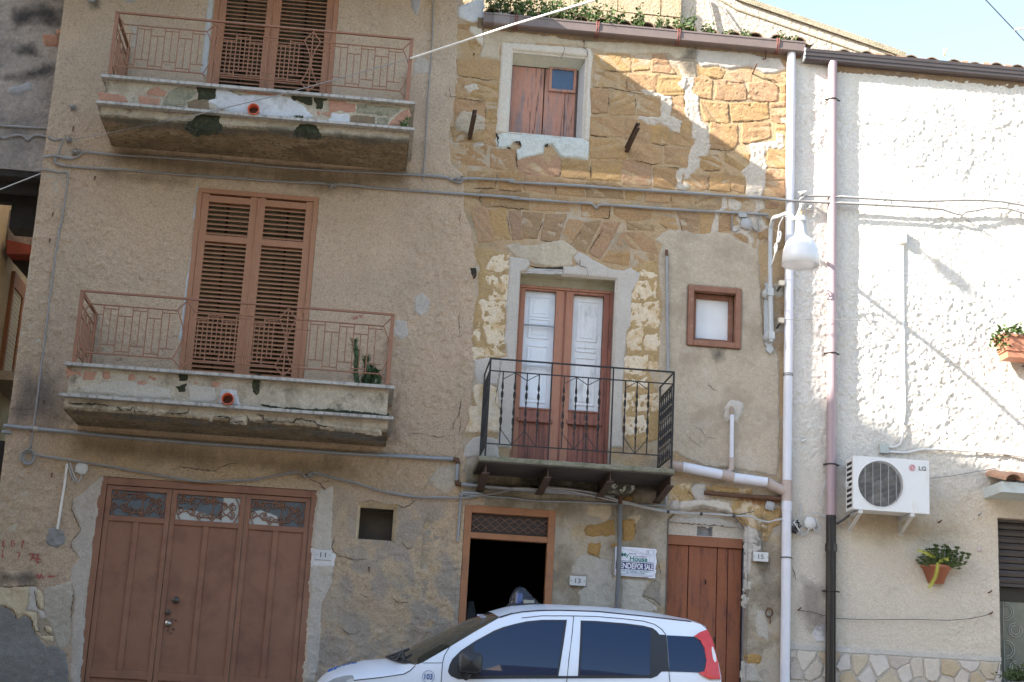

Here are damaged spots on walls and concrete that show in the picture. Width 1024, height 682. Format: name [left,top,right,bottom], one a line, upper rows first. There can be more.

leakage [258,129,404,144]
spalling [317,100,375,124]
spalling [451,24,786,448]
spalling [584,504,640,558]
spalling [668,482,694,502]
spalling [674,486,782,542]
spalling [0,476,104,682]